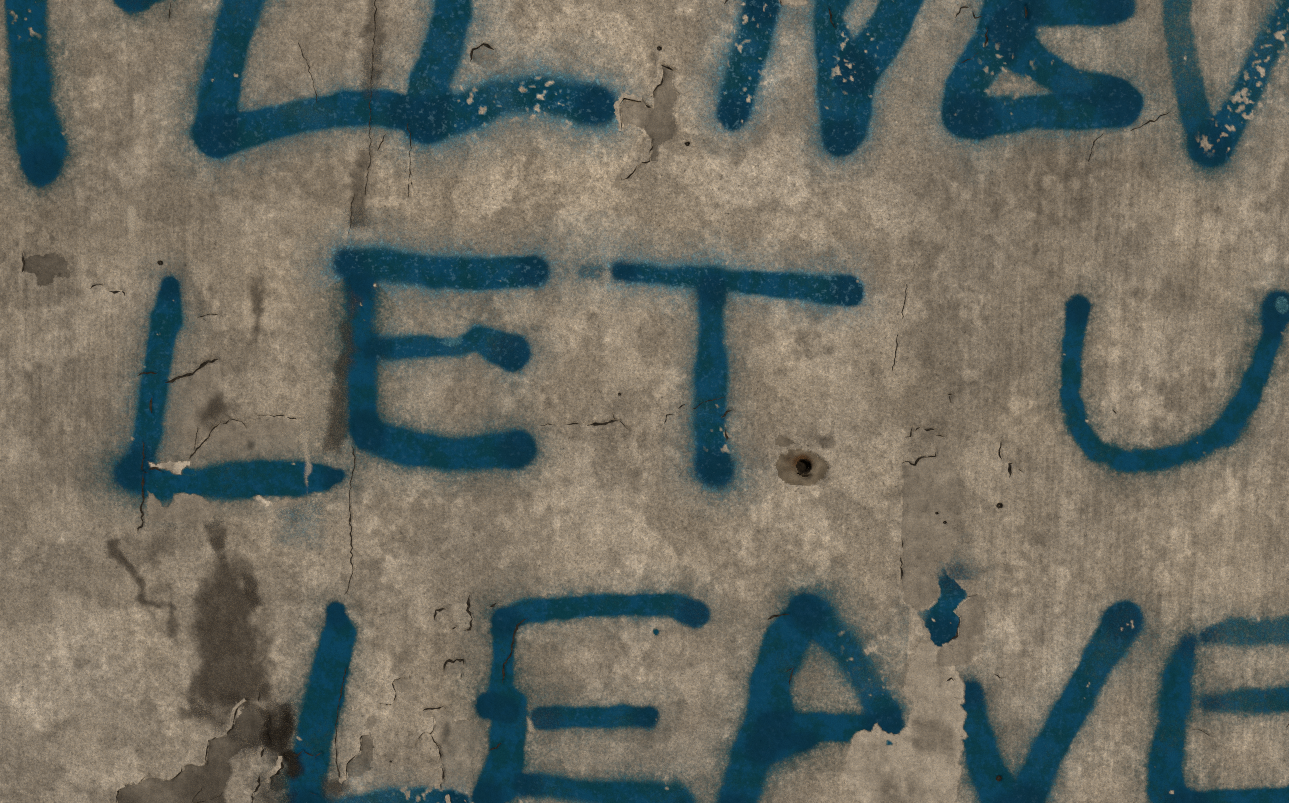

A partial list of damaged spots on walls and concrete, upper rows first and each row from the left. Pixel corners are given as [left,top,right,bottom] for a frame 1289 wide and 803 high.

crack [348,0,412,233]
spalling [614,46,690,180]
crack [137,359,218,531]
damp [191,526,268,715]
spalling [110,698,270,803]
spalling [264,756,288,792]
damp [265,711,302,778]